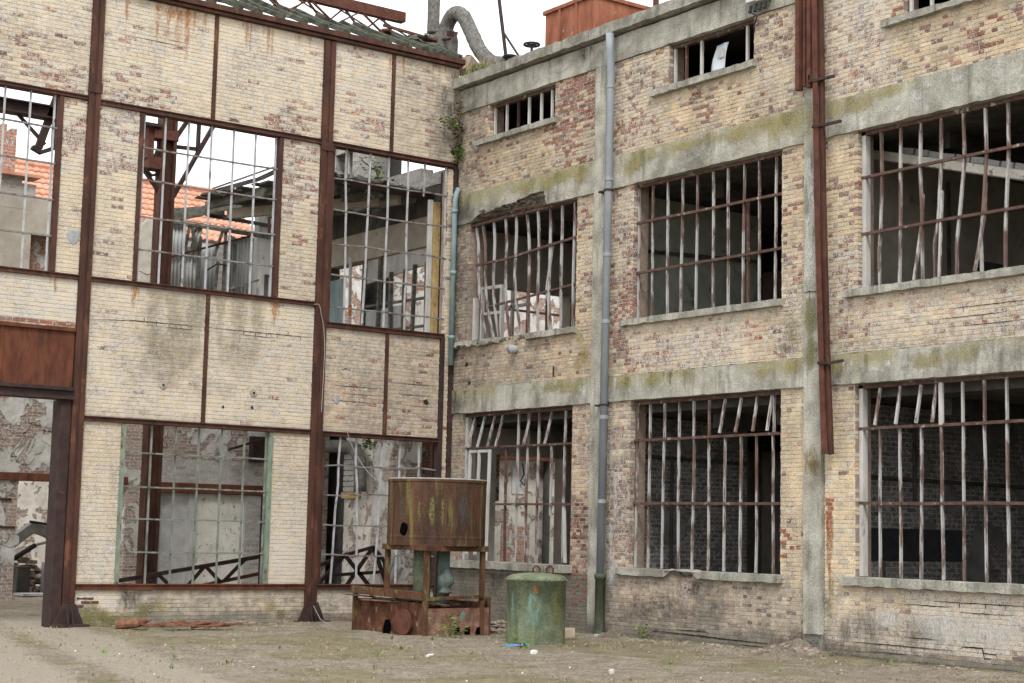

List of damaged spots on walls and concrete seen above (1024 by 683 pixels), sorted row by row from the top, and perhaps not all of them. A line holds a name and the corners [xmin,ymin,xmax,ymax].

peeling [0,409,53,465]
peeling [0,503,19,576]